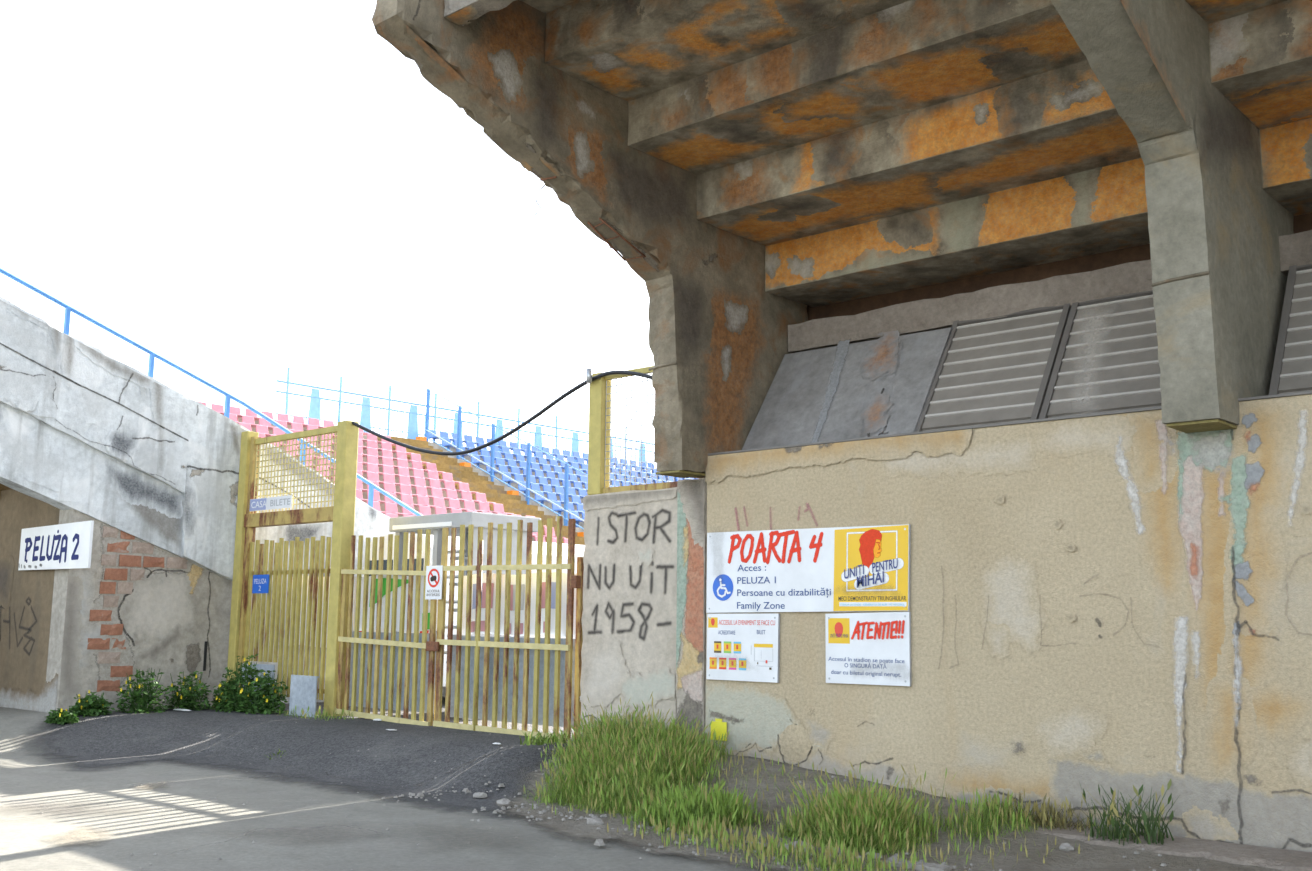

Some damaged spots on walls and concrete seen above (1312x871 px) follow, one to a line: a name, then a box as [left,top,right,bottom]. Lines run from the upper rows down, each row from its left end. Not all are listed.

corrosion [406,0,546,118]
corrosion [1232,79,1312,188]
corrosion [1279,0,1312,64]
spalling [587,218,659,272]
corrosion [566,0,1148,484]
crack [4,370,239,478]
damp [0,300,246,551]
peeling [1156,413,1264,610]
flaking render [68,524,192,692]
peeling [676,492,910,789]
crack [990,550,1311,844]
crack [1283,839,1312,849]